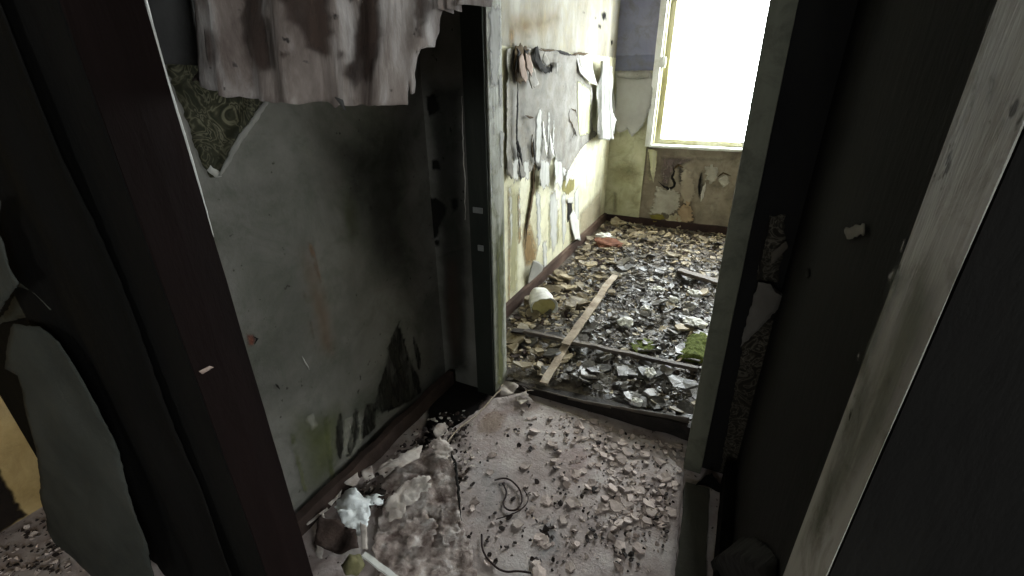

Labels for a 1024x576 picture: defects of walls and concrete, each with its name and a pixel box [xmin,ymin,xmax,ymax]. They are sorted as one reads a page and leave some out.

peeling [489,7,502,109]
spalling [513,43,562,89]
peeling [577,55,597,136]
peeling [491,109,581,284]
peeling [648,149,729,230]
leakage [309,322,421,478]